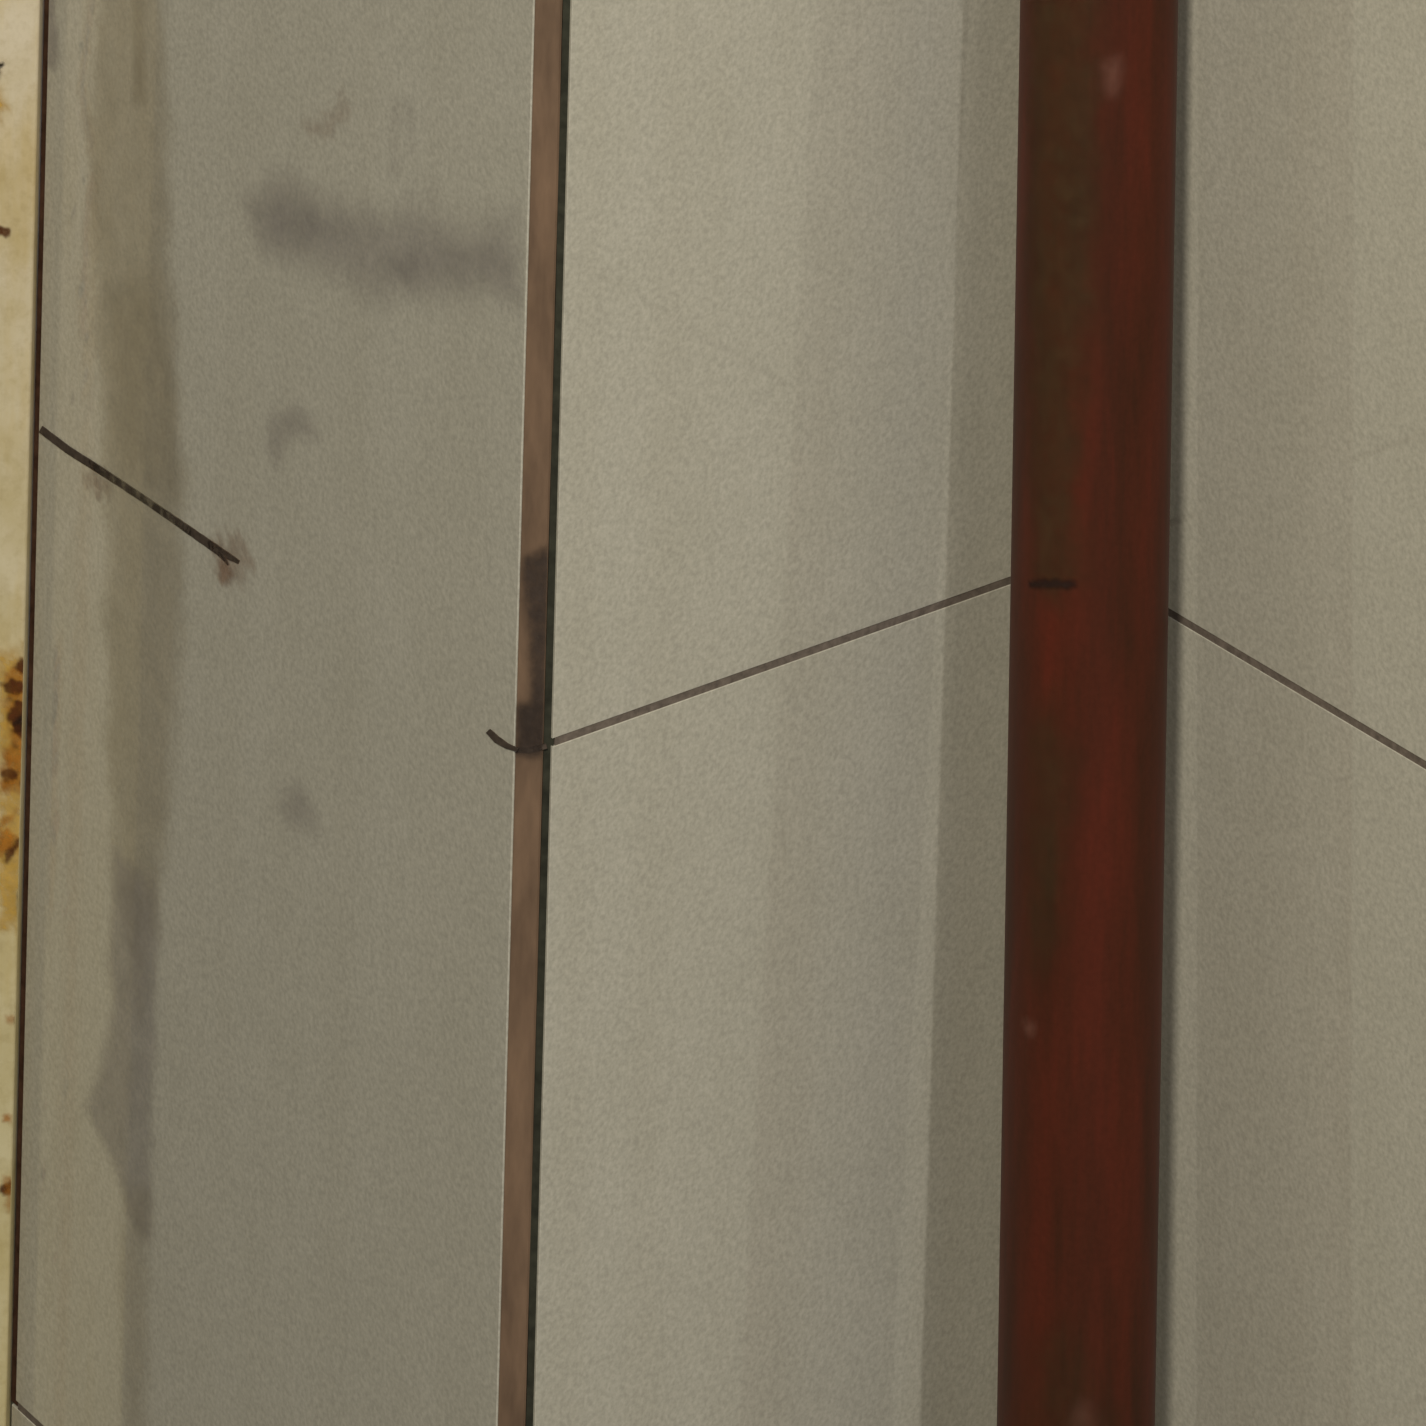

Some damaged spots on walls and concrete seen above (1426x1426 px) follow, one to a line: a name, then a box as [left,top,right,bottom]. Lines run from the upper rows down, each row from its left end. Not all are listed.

crack [39,426,240,565]
corrosion [0,657,23,929]